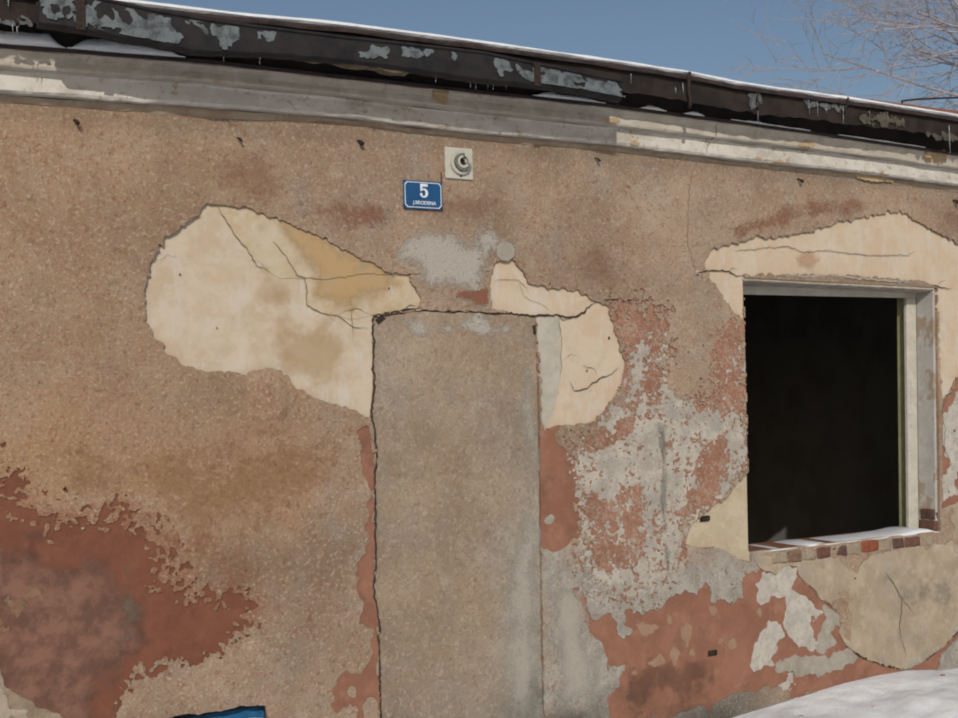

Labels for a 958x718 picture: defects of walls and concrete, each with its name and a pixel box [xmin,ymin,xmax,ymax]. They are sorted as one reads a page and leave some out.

peeling [0,15,33,27]
peeling [40,0,240,50]
peeling [257,30,276,42]
peeling [358,45,434,59]
peeling [432,89,449,105]
peeling [493,58,625,98]
crack [687,167,951,289]
flaking render [144,204,421,718]
crack [219,209,655,718]
flaking render [490,211,958,718]
flaking render [0,467,261,718]
crack [840,572,958,670]